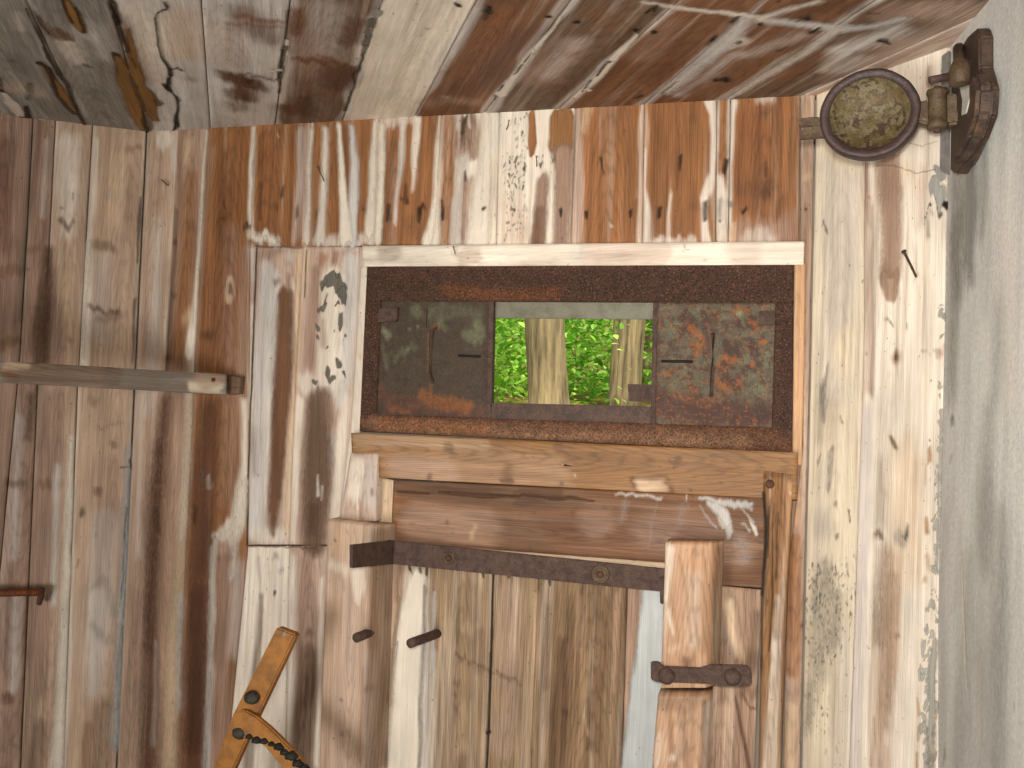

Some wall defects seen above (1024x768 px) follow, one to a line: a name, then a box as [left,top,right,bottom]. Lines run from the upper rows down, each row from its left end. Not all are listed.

crack [154,2,183,131]
peeling [316,270,347,349]
peeling [931,408,944,575]
peeling [918,589,939,768]